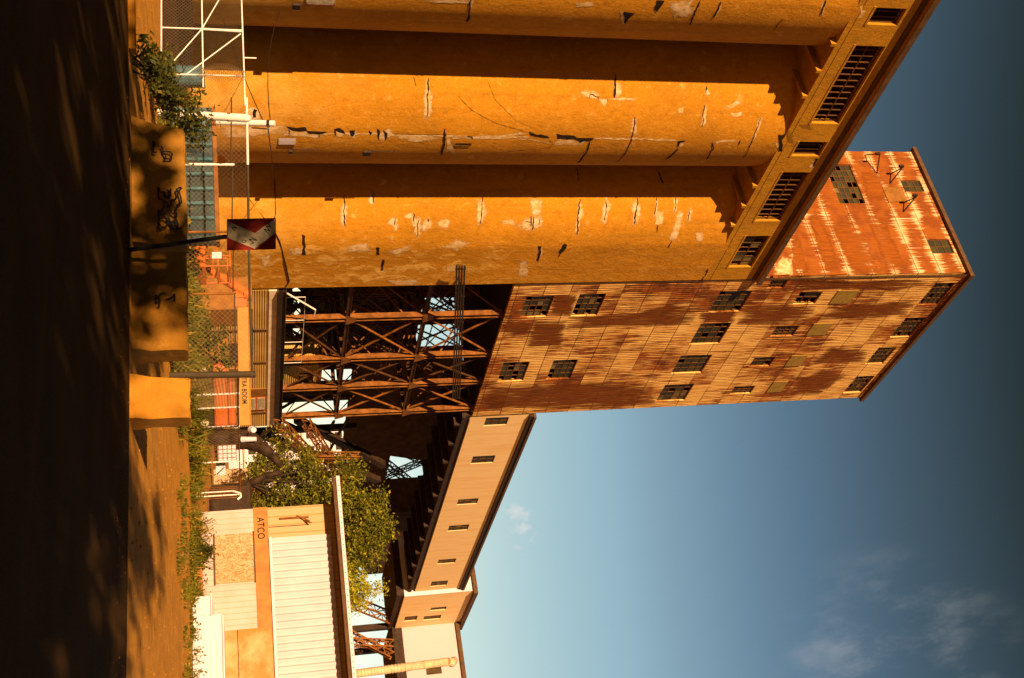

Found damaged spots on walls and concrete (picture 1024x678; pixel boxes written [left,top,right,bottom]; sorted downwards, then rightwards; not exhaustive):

spalling [581,75,635,106]
peeling [221,107,677,146]
crack [394,78,553,155]
crack [618,118,637,161]
crack [654,87,762,222]
crack [575,141,591,234]
crack [476,197,487,226]
spalling [502,199,543,231]
spalling [347,213,450,285]
rust [501,215,926,346]
rust [793,348,867,394]
rust [479,383,654,409]